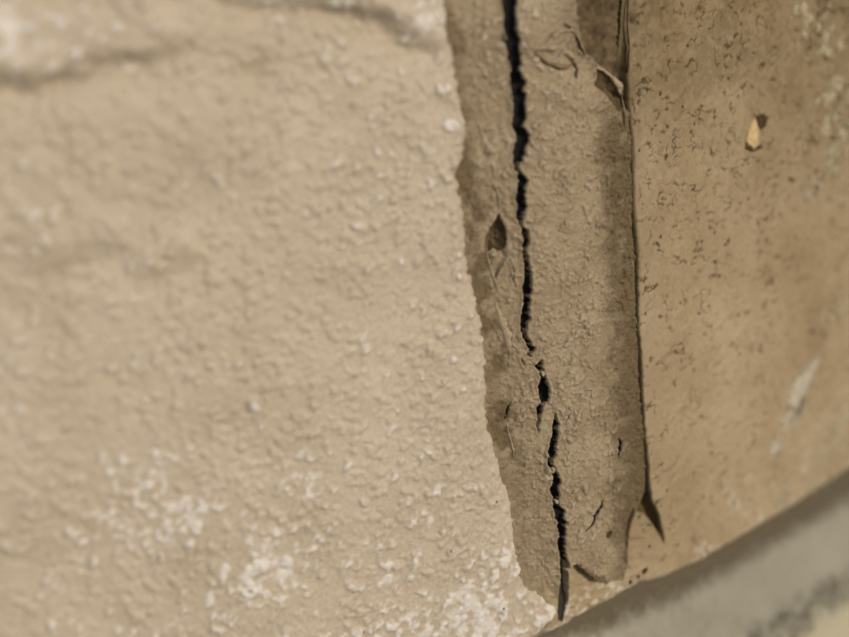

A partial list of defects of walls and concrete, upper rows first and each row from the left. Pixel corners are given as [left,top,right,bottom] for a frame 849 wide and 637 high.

peeling [522,23,586,78]
peeling [579,66,627,126]
crack [500,0,569,621]